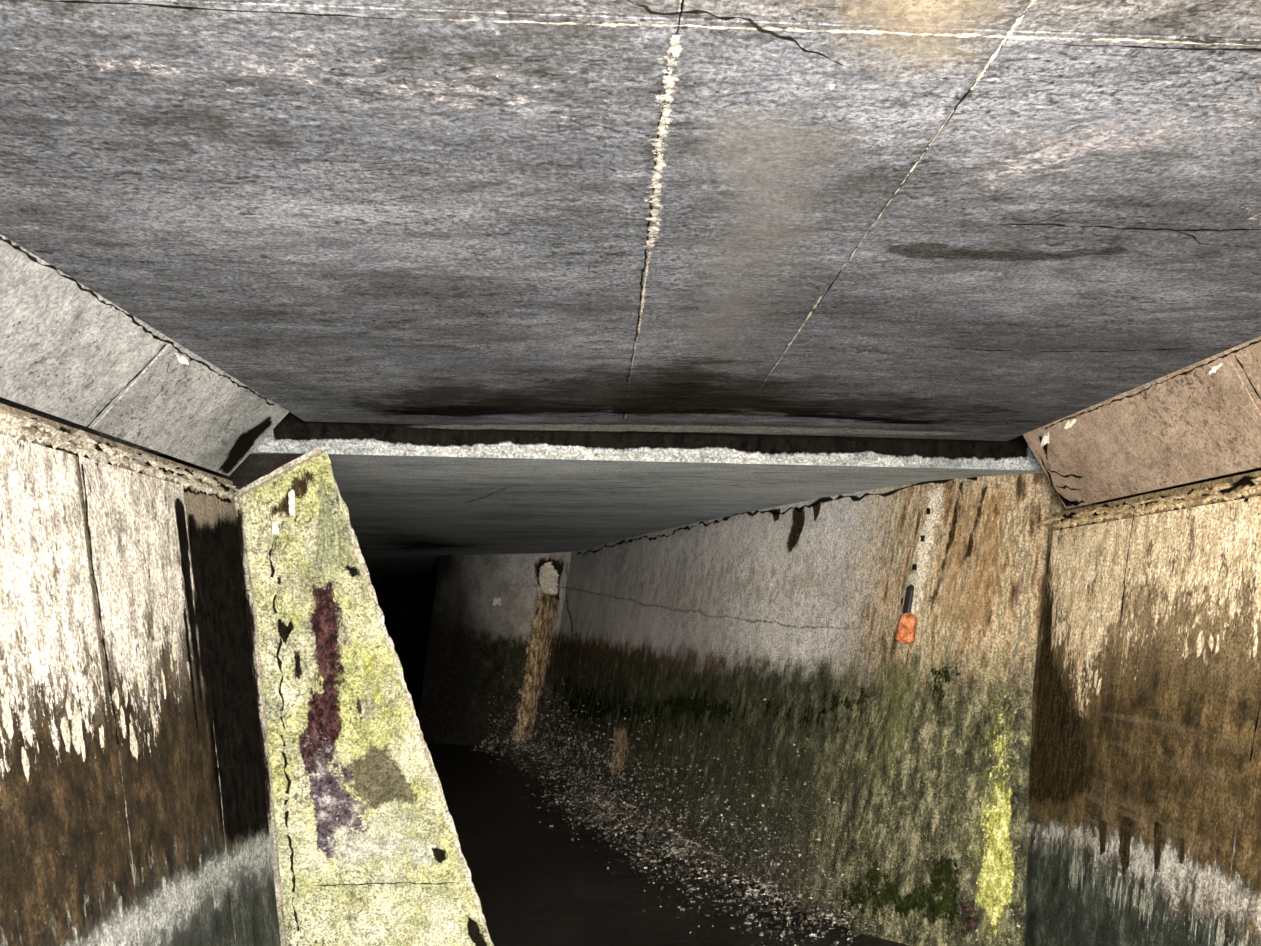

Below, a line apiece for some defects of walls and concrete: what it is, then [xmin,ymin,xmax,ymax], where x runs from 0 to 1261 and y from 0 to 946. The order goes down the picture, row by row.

leakage [460,0,1076,55]
leakage [1092,38,1261,46]
crack [627,0,844,377]
crack [764,0,1036,381]
crack [0,236,276,745]
leakage [0,498,276,946]
crack [269,518,459,946]
leakage [219,352,1048,474]
leakage [930,481,987,609]
leakage [977,787,1014,928]
leakage [1012,537,1092,805]
leakage [1026,807,1261,946]